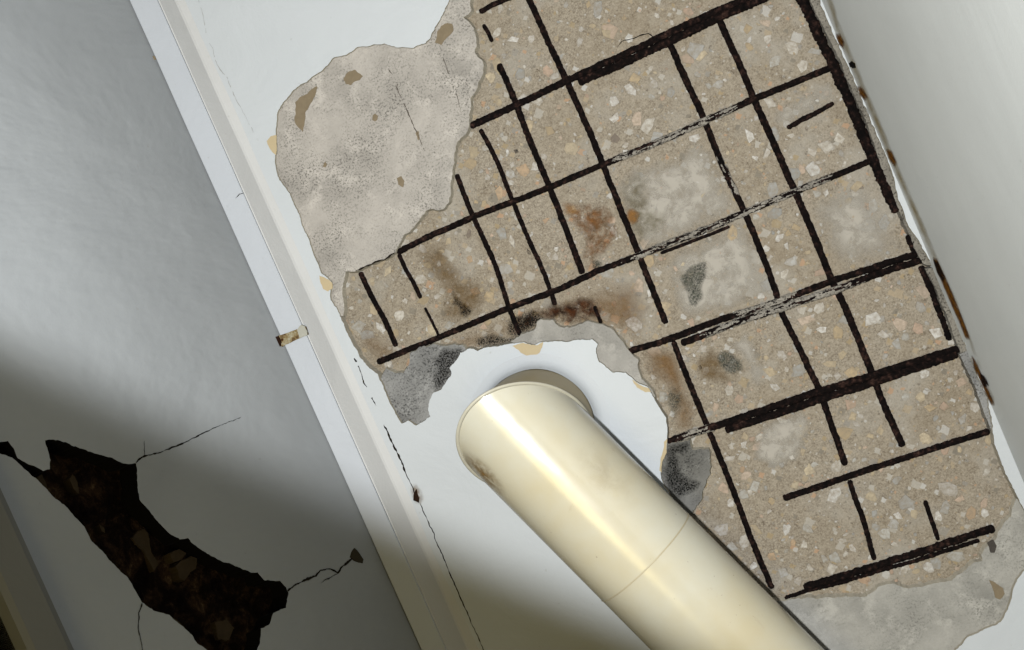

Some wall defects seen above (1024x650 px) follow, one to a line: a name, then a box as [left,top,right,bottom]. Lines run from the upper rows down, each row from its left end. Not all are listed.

corrosion [568,207,608,254]
leakage [677,234,760,310]
corrosion [933,259,969,338]
leakage [478,312,541,345]
spalling [267,0,1024,650]
leakage [435,350,462,389]
crack [136,417,241,463]
leakage [667,446,698,495]
crack [354,358,484,650]
spalling [33,452,273,650]
crack [287,548,364,591]